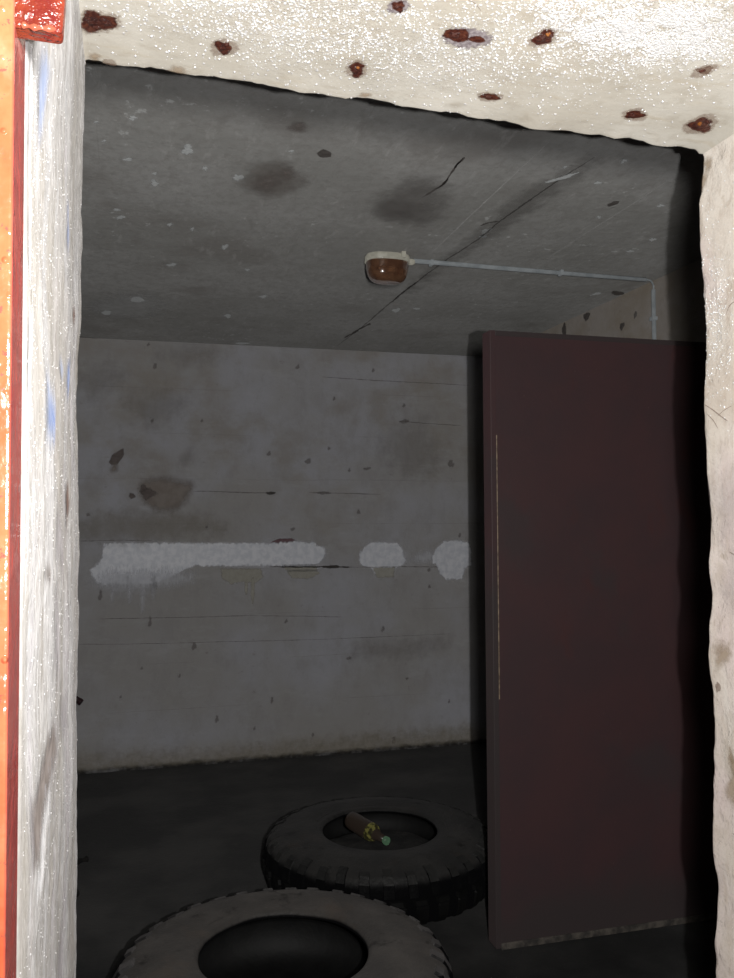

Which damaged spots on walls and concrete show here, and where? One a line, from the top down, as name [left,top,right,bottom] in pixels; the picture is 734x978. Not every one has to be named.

corrosion [387,0,410,14]
corrosion [441,27,493,49]
corrosion [531,29,554,45]
corrosion [215,41,232,55]
corrosion [349,62,364,78]
corrosion [625,111,646,119]
corrosion [687,117,713,132]
leakage [246,165,296,195]
crack [337,157,593,346]
leakage [129,478,191,509]